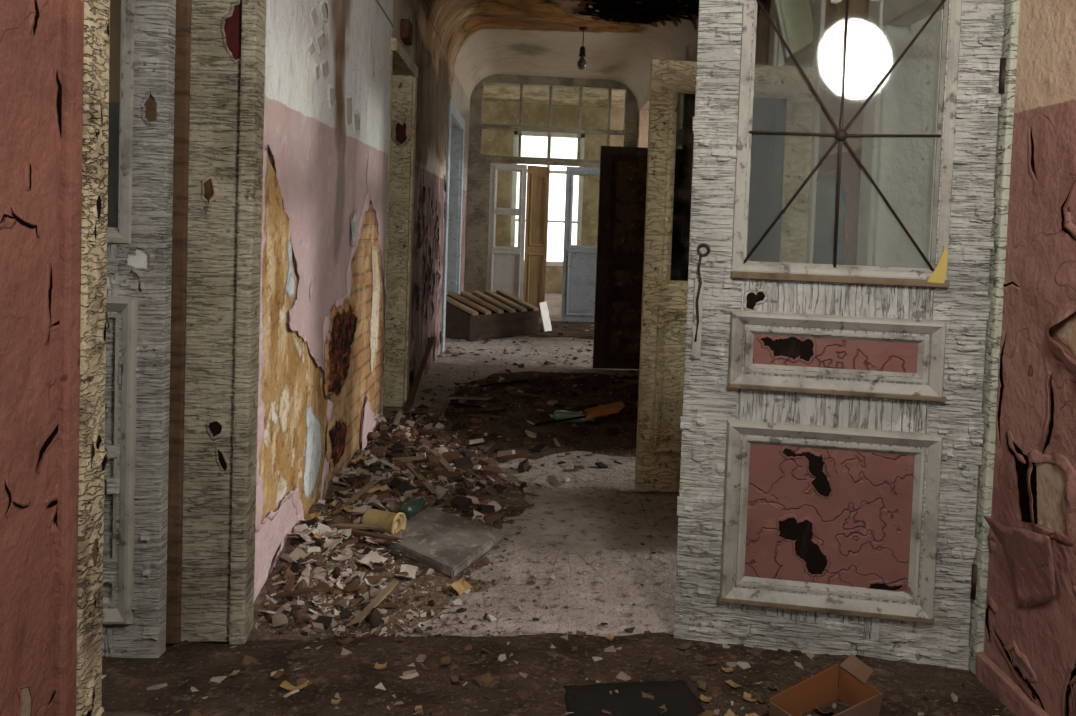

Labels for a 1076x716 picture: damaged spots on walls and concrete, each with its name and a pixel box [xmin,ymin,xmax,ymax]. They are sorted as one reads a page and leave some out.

crack [29,0,40,34]
crack [51,67,62,153]
crack [1027,128,1037,184]
crack [0,163,40,238]
crack [1061,180,1076,241]
crack [42,264,60,345]
flaking render [255,145,387,532]
flaking render [1045,301,1076,378]
crack [996,331,1054,466]
crack [5,425,60,553]
peeling [1012,440,1076,546]
crack [985,596,1076,716]